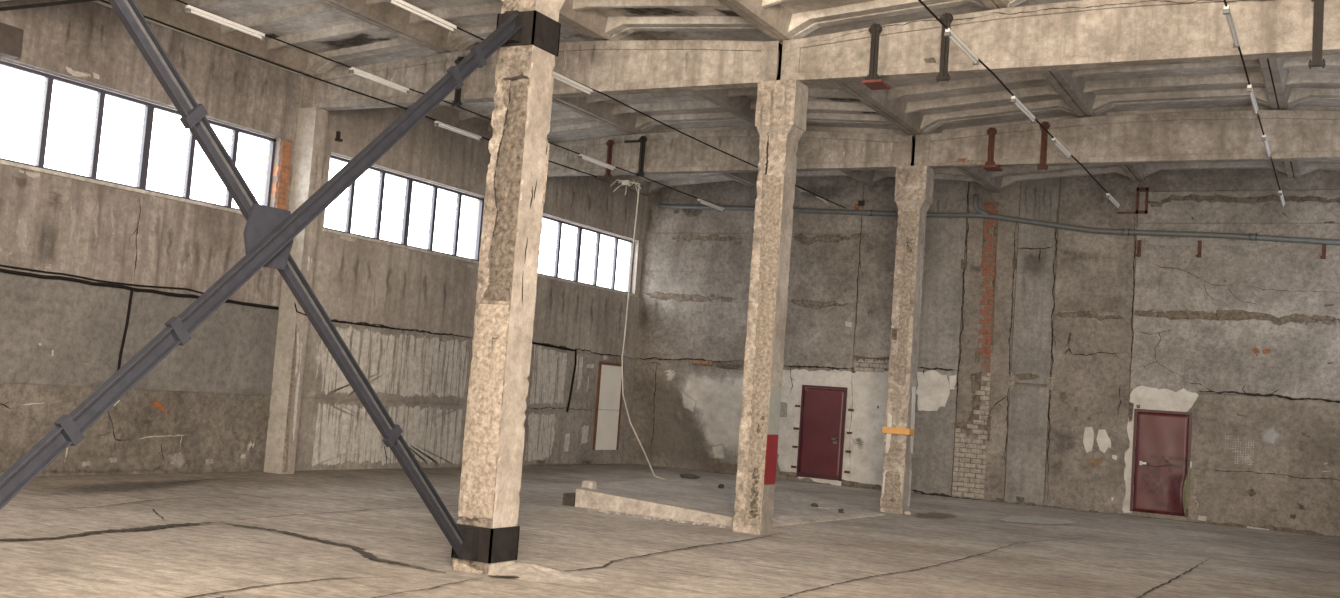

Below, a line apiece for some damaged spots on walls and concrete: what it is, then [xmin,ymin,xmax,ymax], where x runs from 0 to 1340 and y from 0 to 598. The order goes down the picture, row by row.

crack [0,497,520,598]
crack [565,532,786,581]
peeling [665,136,892,525]
flaking render [907,202,1098,512]
crack [781,190,1340,598]
peeling [1083,385,1199,513]